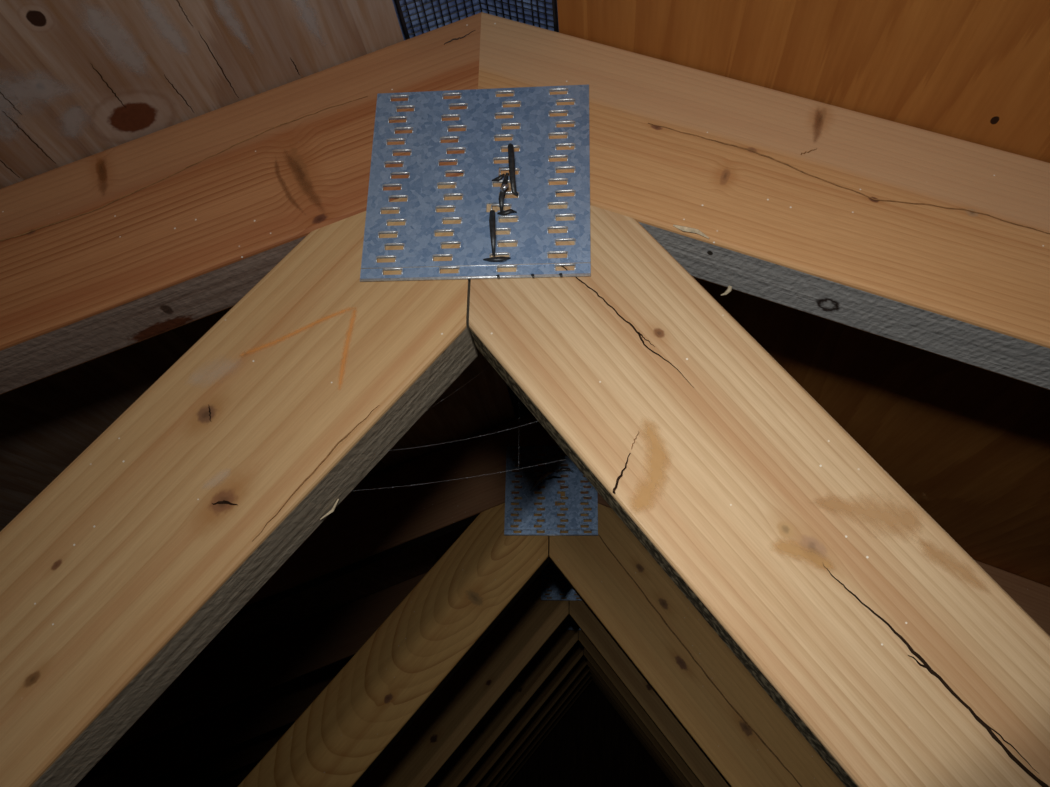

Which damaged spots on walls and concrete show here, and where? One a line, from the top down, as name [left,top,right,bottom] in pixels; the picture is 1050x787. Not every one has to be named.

crack [648,123,1050,234]
crack [561,266,688,381]
crack [613,430,639,494]
crack [822,562,1049,787]